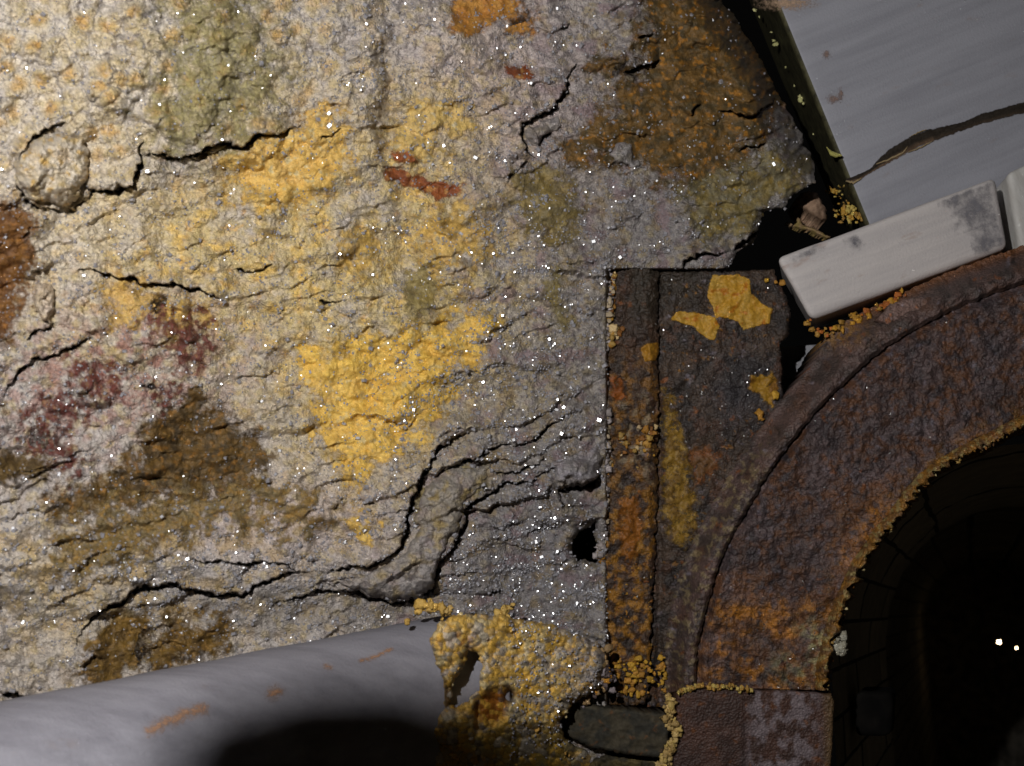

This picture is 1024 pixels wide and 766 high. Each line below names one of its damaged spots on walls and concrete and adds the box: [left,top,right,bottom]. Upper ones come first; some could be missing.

corrosion [505,65,534,80]
corrosion [559,0,785,193]
crack [15,125,341,211]
corrosion [384,151,464,201]
crack [846,103,1024,181]
corrosion [0,195,45,345]
crack [79,268,219,299]
crack [3,323,91,398]
corrosion [748,373,779,408]
peeling [617,424,658,457]
crack [76,422,598,645]
spalling [572,522,606,564]